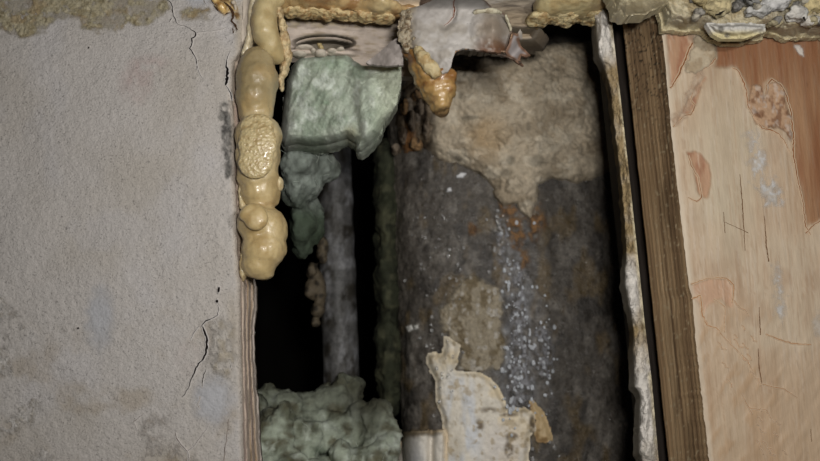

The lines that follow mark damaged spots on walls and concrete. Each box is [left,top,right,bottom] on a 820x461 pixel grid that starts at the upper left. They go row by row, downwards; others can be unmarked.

leakage [0,0,168,38]
crack [149,0,226,79]
leakage [181,0,209,19]
crack [224,52,233,101]
crack [182,305,233,397]
leakage [439,258,553,407]